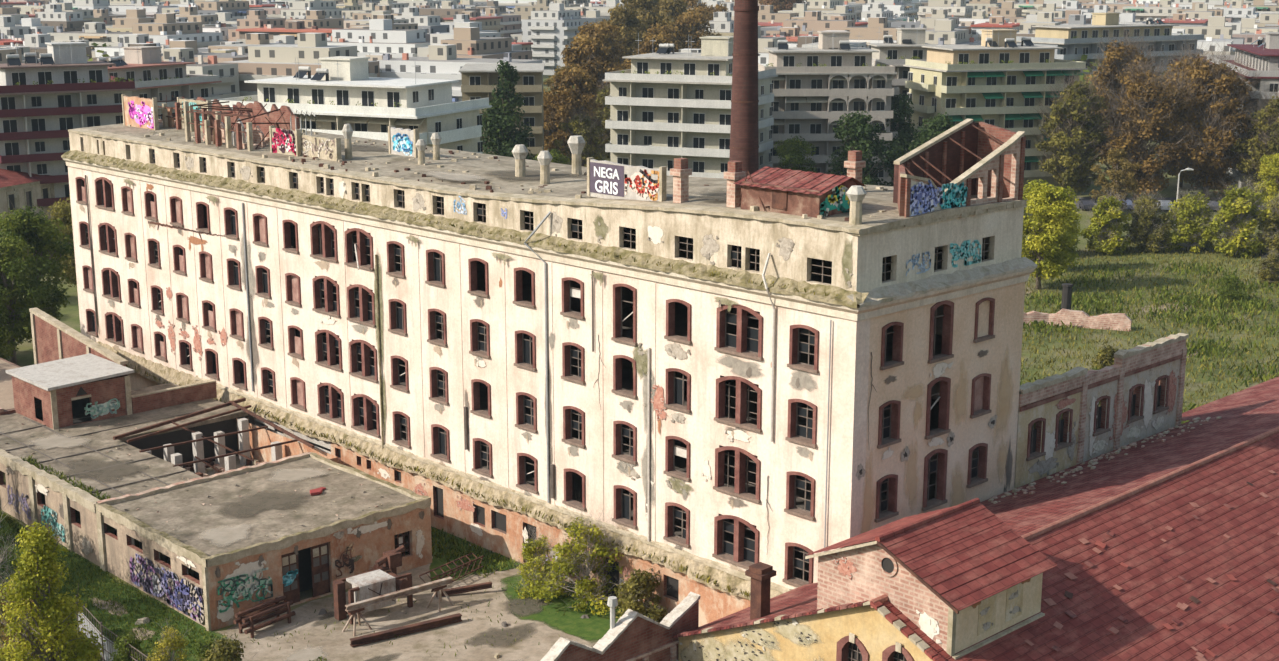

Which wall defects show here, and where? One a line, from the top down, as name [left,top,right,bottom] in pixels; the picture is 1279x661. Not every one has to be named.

water stain [694,190,727,200]
water stain [522,333,555,477]
water stain [618,358,655,519]
peeling [650,384,685,434]
peeling [1044,370,1180,461]
water stain [201,469,325,546]
water stain [729,497,746,508]
peeling [680,618,818,661]